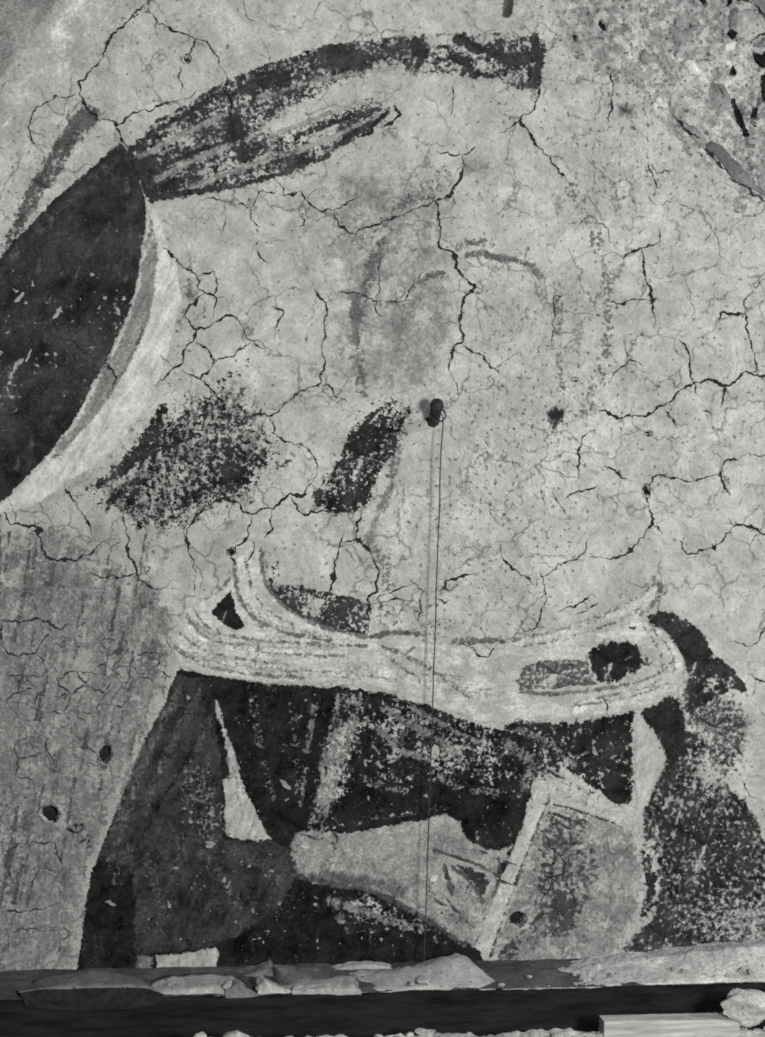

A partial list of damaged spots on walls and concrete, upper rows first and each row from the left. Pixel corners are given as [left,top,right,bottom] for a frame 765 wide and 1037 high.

crack [499,83,570,190]
crack [594,73,614,121]
spalling [556,0,765,203]
crack [3,0,517,634]
crack [453,160,765,658]
crack [0,617,172,783]
crack [730,627,765,698]
crack [1,841,75,959]
crack [536,835,582,909]